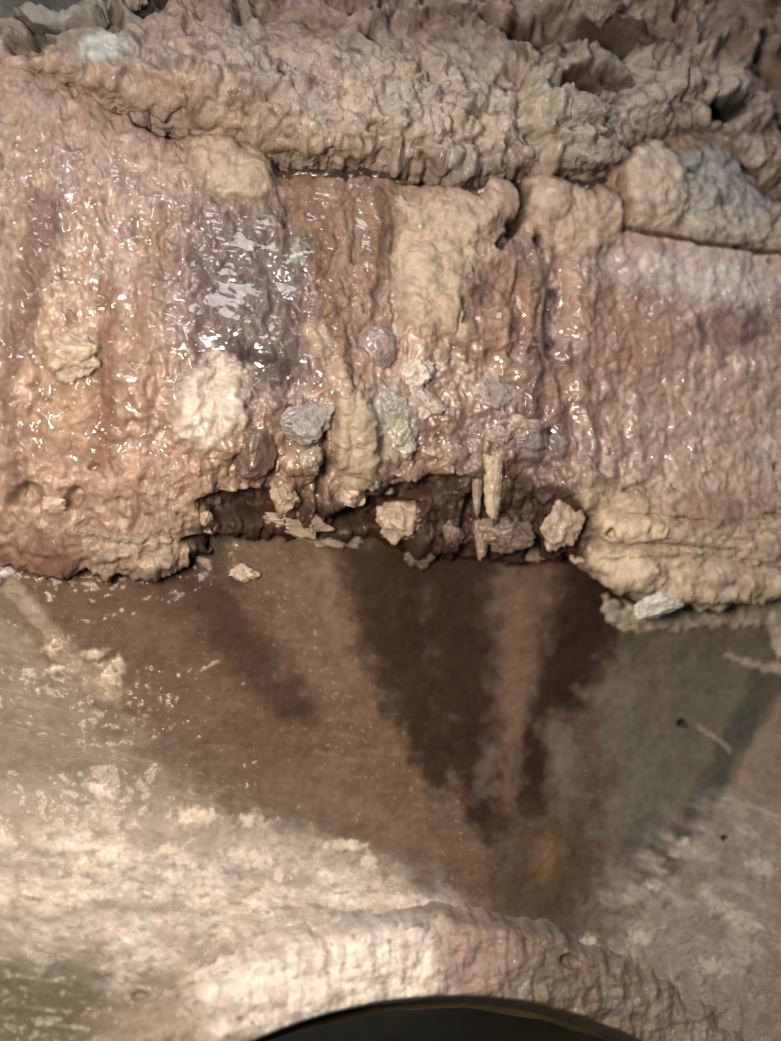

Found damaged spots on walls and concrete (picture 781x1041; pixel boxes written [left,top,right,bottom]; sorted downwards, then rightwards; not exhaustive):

spalling [0,0,130,64]
water stain [0,254,18,335]
water stain [194,208,320,387]
water stain [609,250,781,307]
water stain [366,386,417,453]
peeling [575,465,781,658]
water stain [0,419,781,985]